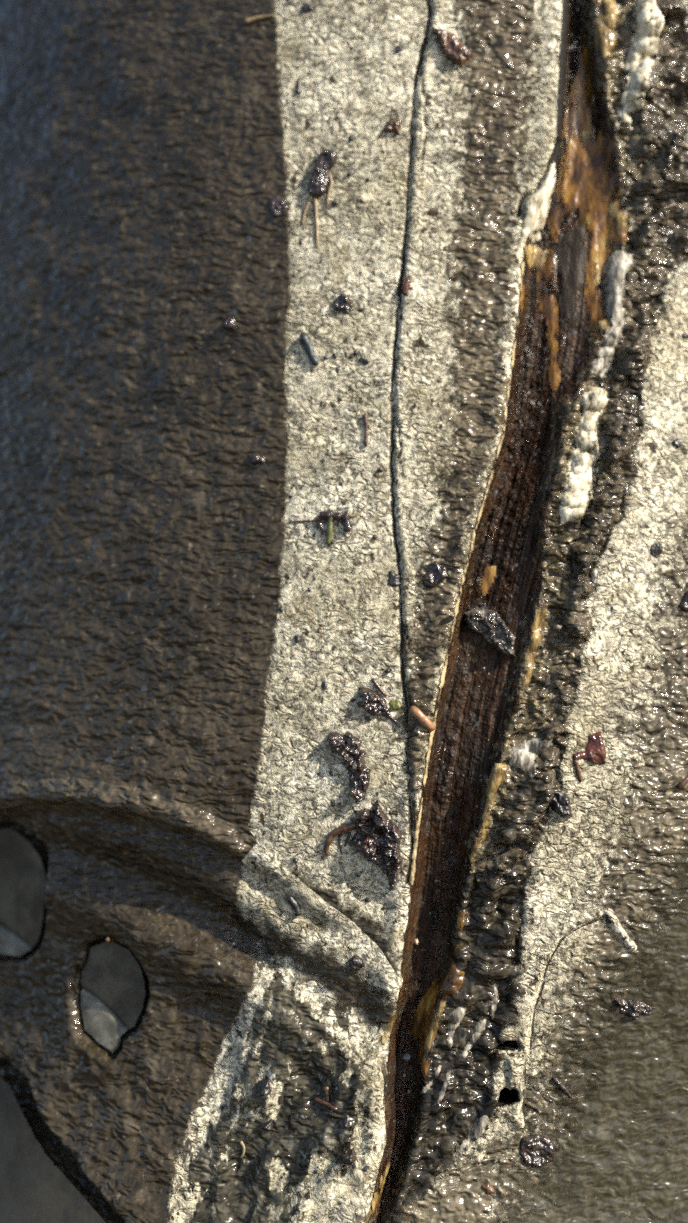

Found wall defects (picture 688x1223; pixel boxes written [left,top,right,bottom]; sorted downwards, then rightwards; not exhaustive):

peeling [616,0,664,127]
peeling [524,231,550,269]
corrosion [520,0,628,391]
peeling [559,250,633,524]
crack [368,0,625,1223]
peeling [509,737,552,778]
corrosion [411,910,468,1077]